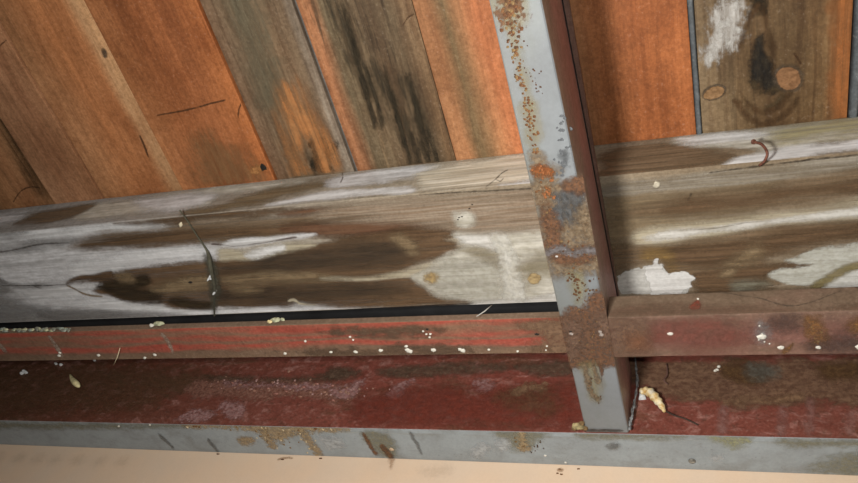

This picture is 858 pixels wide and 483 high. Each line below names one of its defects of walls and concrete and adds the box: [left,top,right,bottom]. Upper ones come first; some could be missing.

leakage [749,0,767,18]
leakage [0,0,557,320]
corrosion [494,0,615,404]
peeling [617,258,695,295]
leakage [597,34,858,177]
leakage [612,170,858,293]
corrosion [629,343,858,410]